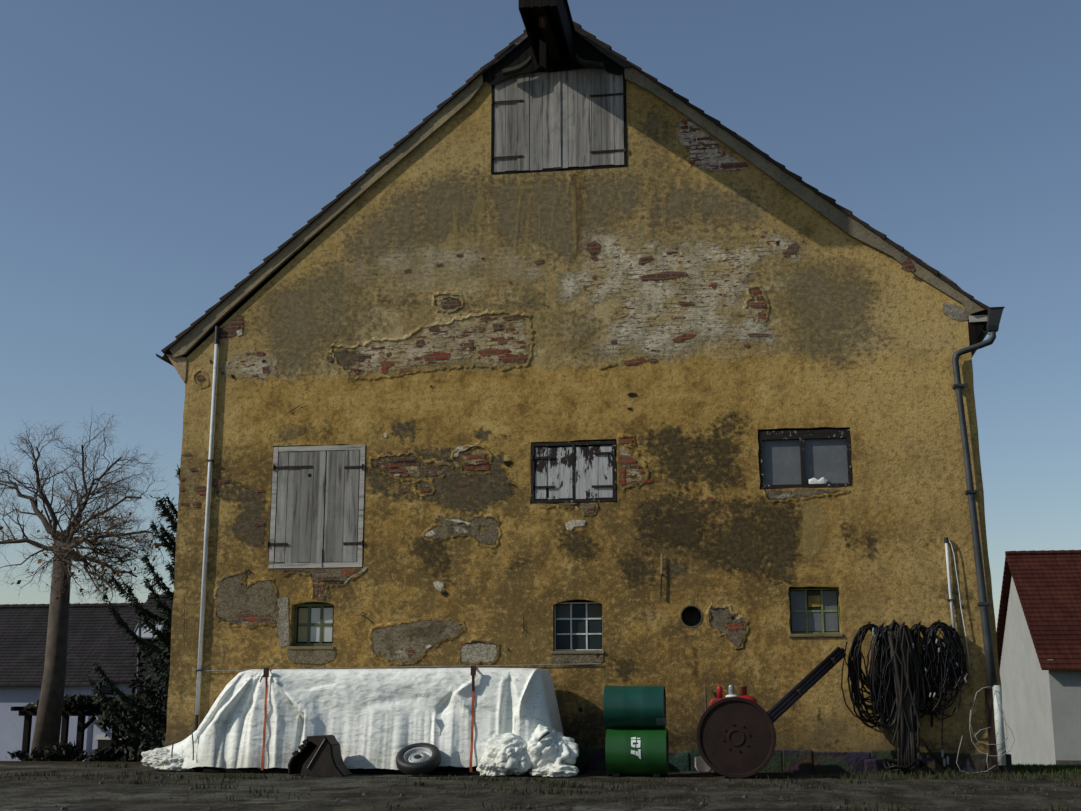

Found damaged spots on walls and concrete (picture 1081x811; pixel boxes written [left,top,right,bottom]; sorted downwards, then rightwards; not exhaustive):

peeling [675,119,750,172]
leakage [650,182,759,230]
spalling [327,291,536,388]
leakage [252,173,639,376]
peeling [554,225,805,371]
leakage [767,266,877,365]
peeling [421,512,503,549]
leakage [619,412,803,587]
peeling [367,616,510,668]